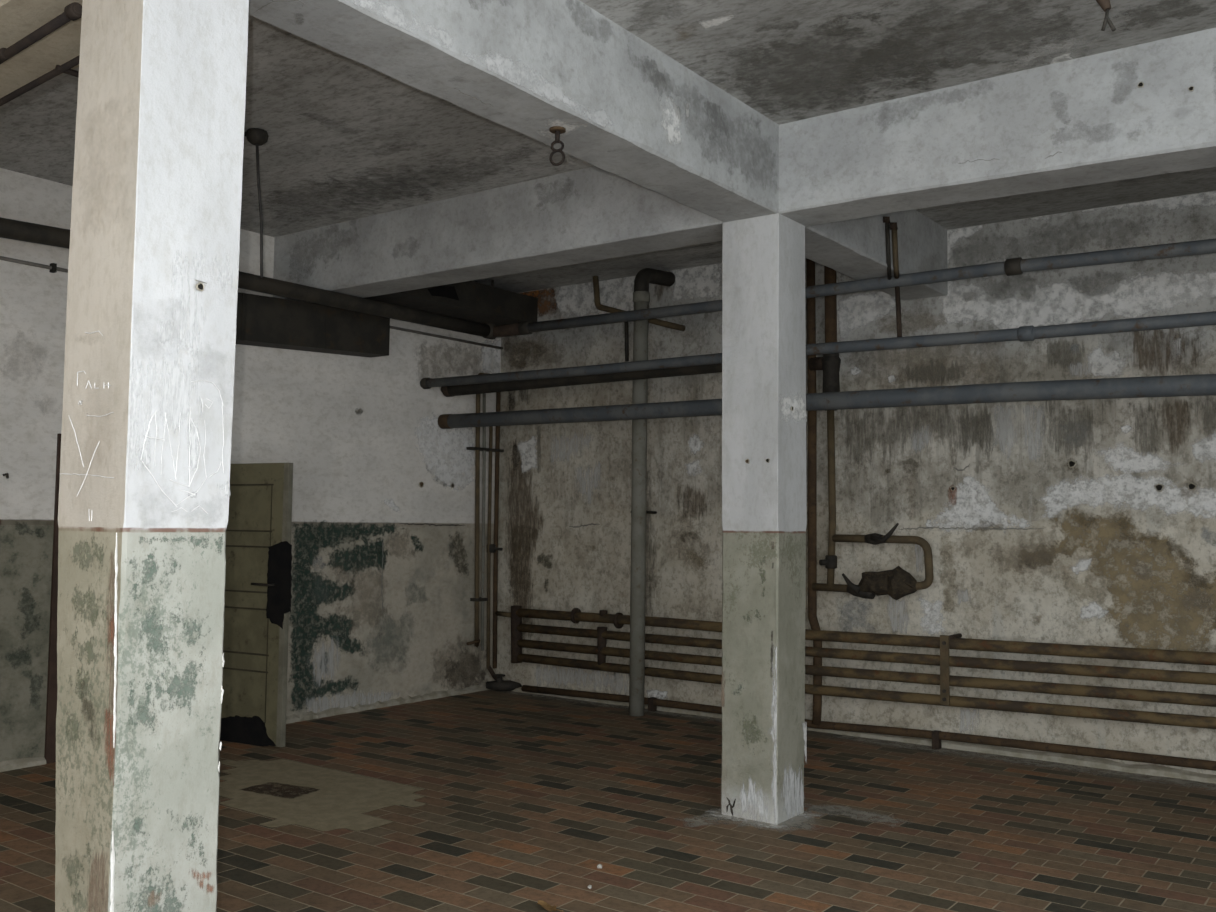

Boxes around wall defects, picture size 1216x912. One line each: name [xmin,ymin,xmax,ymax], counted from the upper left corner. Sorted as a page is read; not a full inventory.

water stain [699,15,733,29]
water stain [718,0,1085,119]
water stain [841,403,1091,463]
water stain [1133,401,1216,452]
water stain [449,534,468,573]
water stain [537,555,552,592]
water stain [1018,509,1216,652]